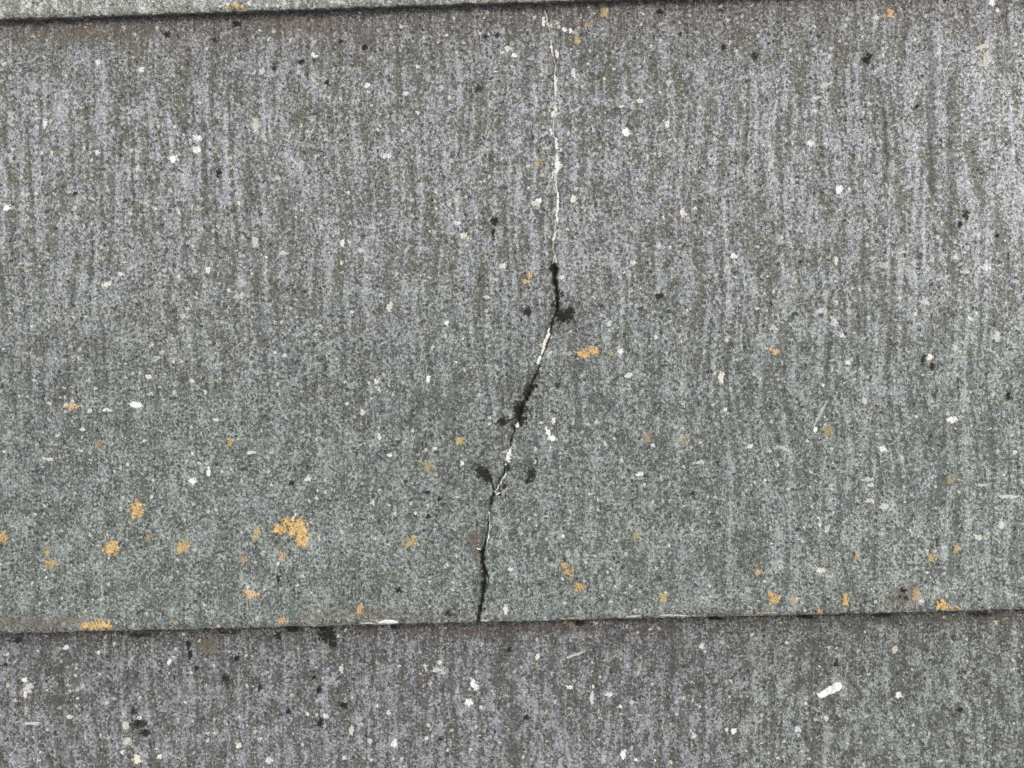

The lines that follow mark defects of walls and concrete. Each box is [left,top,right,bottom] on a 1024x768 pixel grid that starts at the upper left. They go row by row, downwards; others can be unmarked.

crack [475,11,576,620]